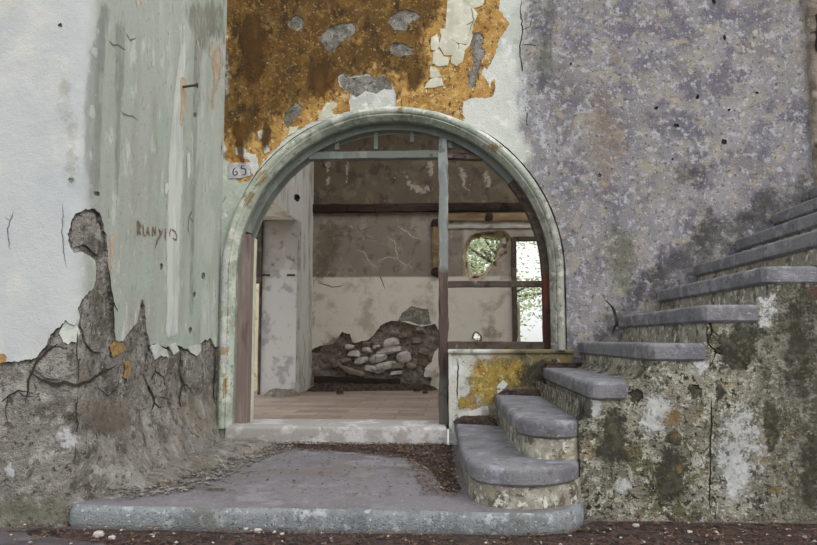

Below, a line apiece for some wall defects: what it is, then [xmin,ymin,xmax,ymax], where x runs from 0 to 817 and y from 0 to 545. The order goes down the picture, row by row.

leakage [224,0,444,163]
peeling [224,0,509,206]
crack [519,0,536,127]
spalling [0,25,229,529]
crack [1,333,120,433]
crack [149,352,193,410]
spalling [311,306,439,385]
leakage [668,430,681,446]
crack [704,401,718,514]
crack [707,323,723,363]
leakage [763,400,779,452]
leakage [801,440,817,510]